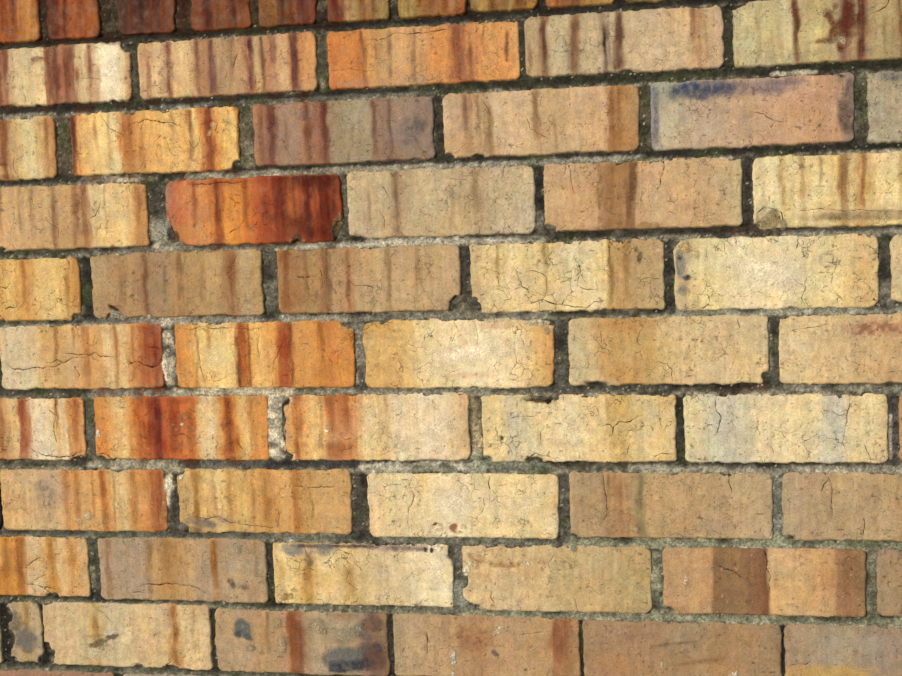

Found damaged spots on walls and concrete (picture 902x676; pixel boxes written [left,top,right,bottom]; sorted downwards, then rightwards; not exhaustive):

corrosion [792,1,800,41]
corrosion [816,0,865,52]
corrosion [275,176,335,237]
crack [501,265,601,308]
crack [32,402,75,458]
corrosion [148,388,176,441]
crack [513,406,640,457]